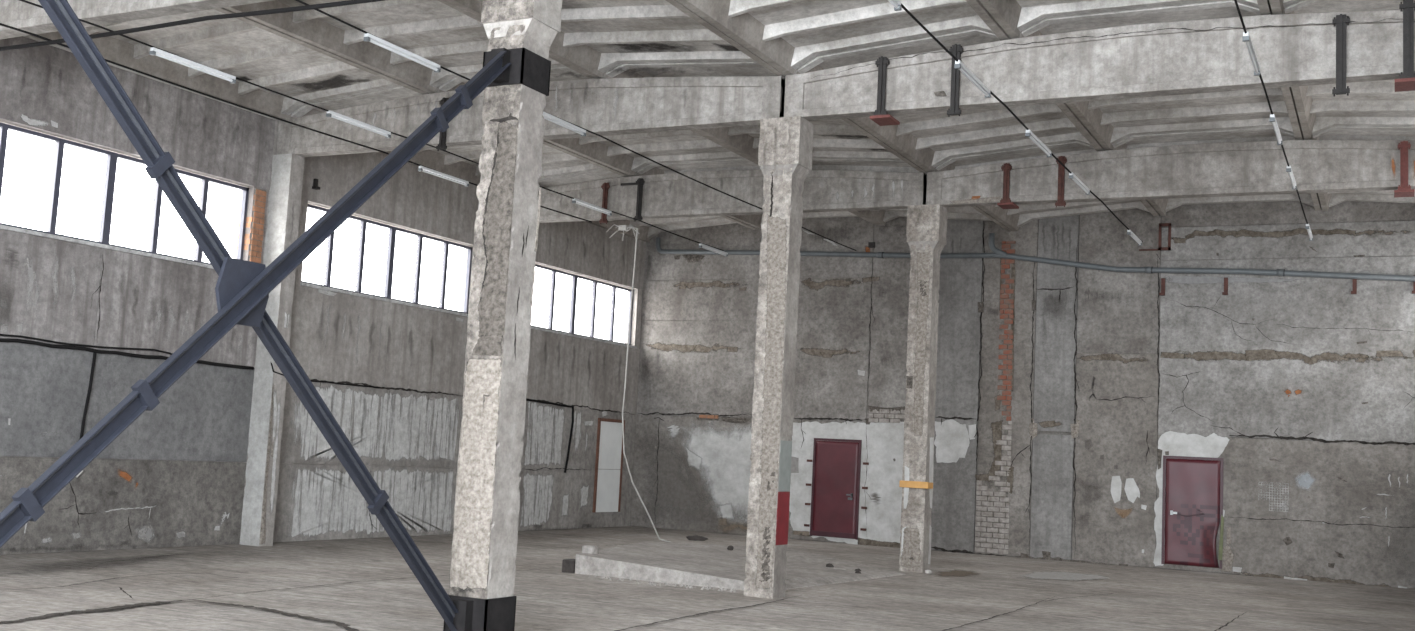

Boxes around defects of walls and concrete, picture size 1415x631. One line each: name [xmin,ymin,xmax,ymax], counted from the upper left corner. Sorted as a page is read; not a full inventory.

spalling [950,196,1003,204]
peeling [667,176,909,588]
flaking render [928,241,1128,566]
crack [932,224,1415,631]
peeling [1111,431,1230,566]
crack [0,573,444,631]
crack [615,596,796,631]